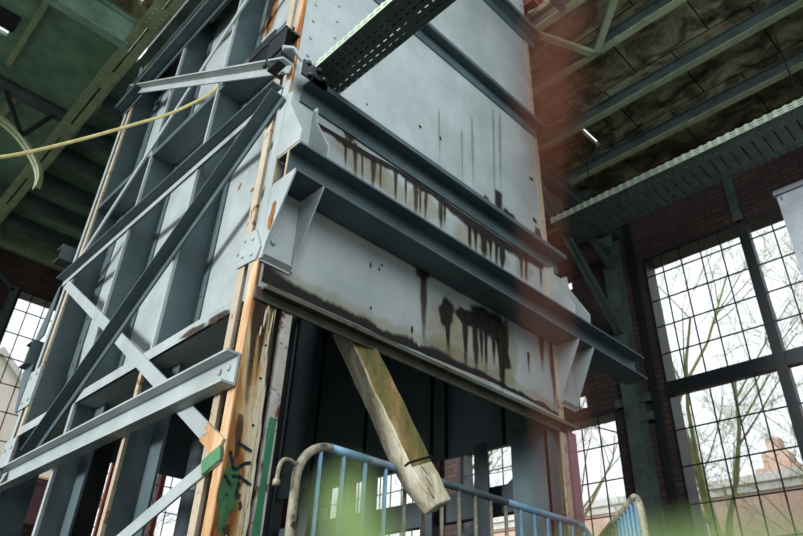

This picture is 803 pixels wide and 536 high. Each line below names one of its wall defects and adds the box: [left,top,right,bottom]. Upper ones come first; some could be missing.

corrosion [262,0,278,36]
corrosion [318,123,539,277]
corrosion [262,264,554,413]